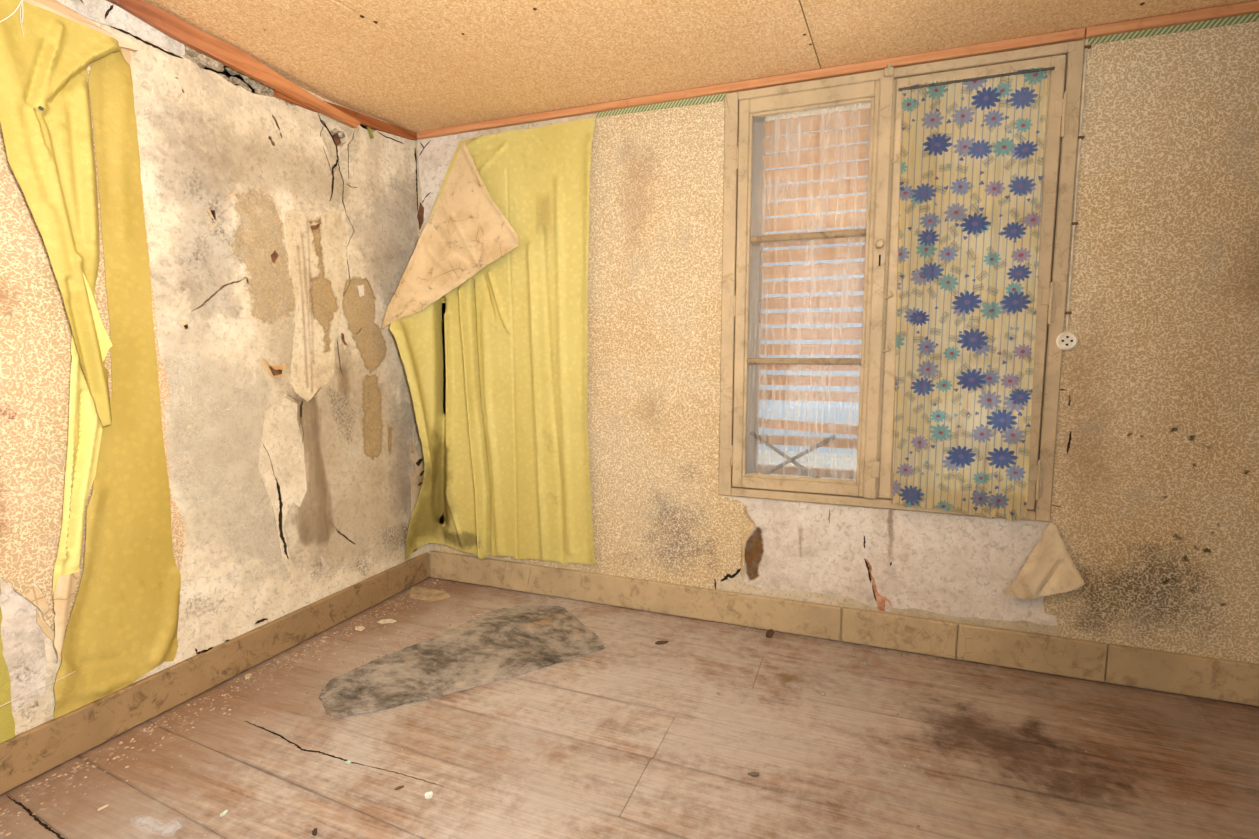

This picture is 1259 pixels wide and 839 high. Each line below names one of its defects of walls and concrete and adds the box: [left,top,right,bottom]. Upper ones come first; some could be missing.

spalling [320,113,367,181]
crack [318,113,431,297]
peeling [417,131,478,230]
peeling [258,208,364,577]
crack [288,328,362,443]
crack [263,444,289,559]
peeling [724,496,1058,626]
crack [245,721,444,787]